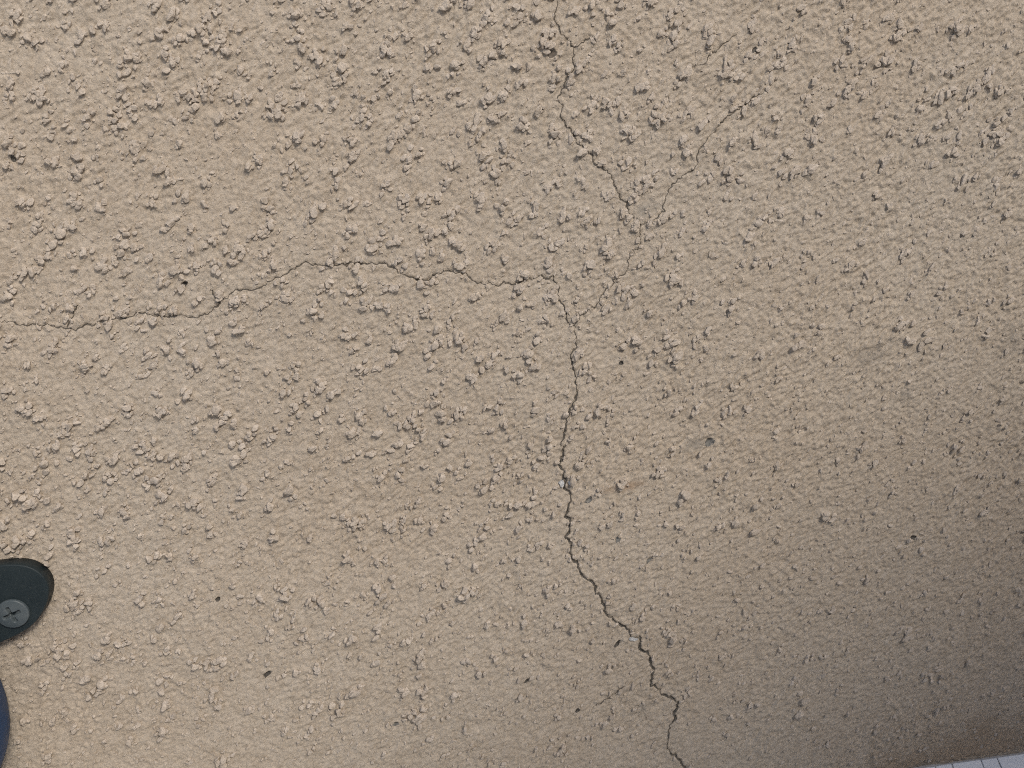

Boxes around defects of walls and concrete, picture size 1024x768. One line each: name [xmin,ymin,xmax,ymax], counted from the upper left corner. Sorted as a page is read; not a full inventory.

crack [1,1,777,768]